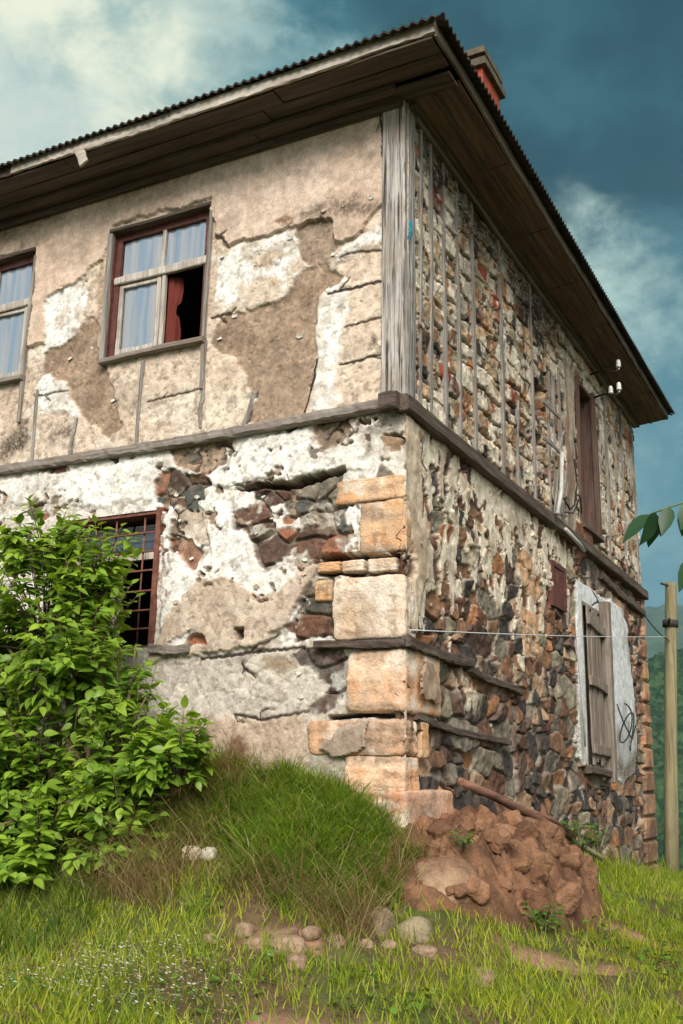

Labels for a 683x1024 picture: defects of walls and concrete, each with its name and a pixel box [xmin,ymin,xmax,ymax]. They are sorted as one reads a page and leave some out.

flaking render [42,246,123,438]
flaking render [210,195,382,423]
crack [327,250,382,295]
peeling [146,423,593,716]
crack [234,708,307,723]